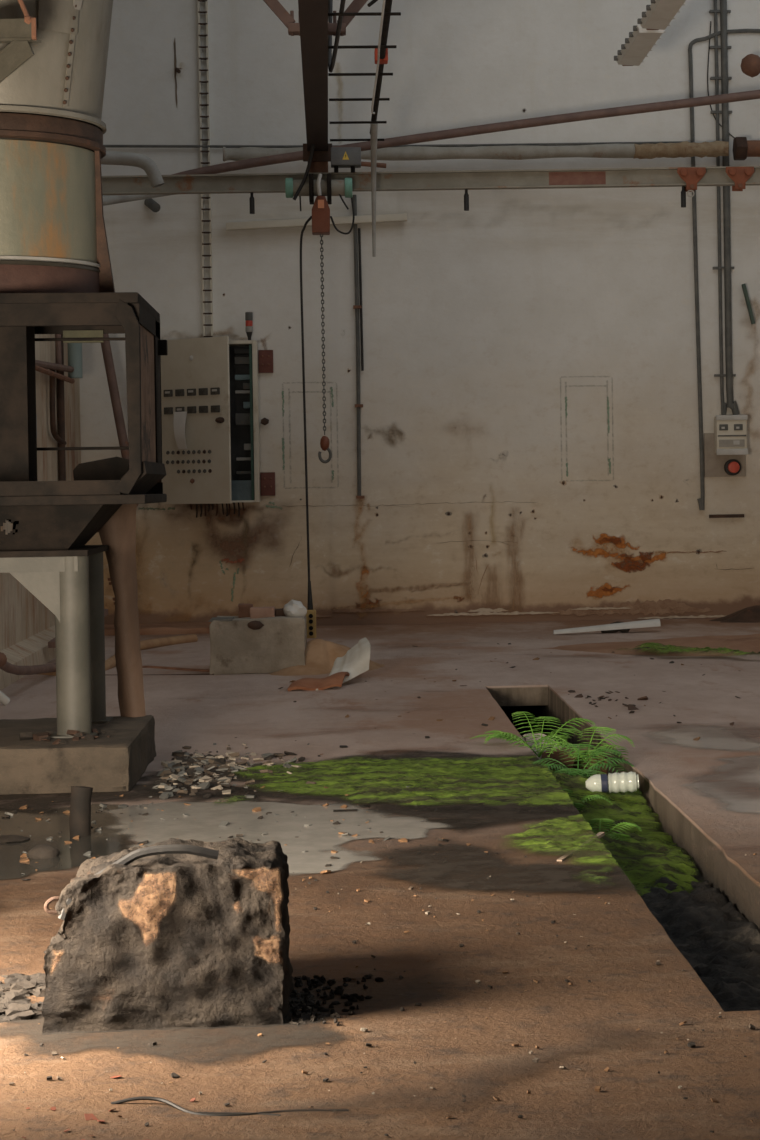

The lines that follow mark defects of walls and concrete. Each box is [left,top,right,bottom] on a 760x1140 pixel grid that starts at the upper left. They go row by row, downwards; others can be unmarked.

rust [573,533,666,572]
rust [587,583,627,598]
leakage [0,793,71,813]
leakage [91,750,635,892]